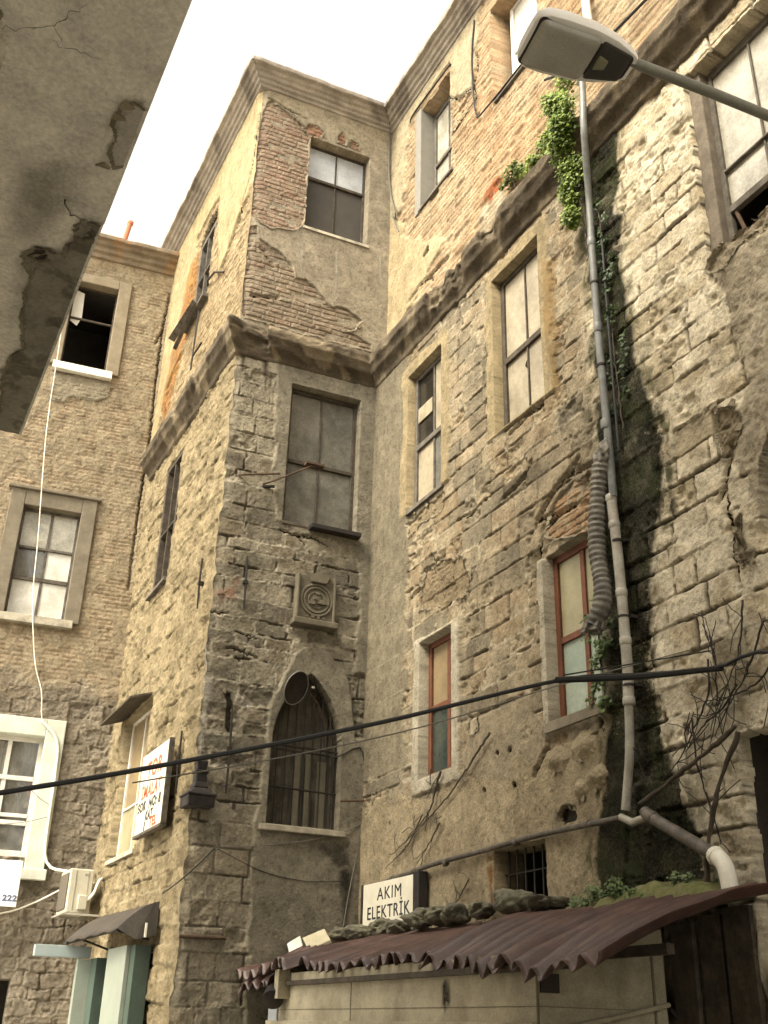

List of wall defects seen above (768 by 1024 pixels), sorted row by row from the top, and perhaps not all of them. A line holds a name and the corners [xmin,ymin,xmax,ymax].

crack [2,7,102,60]
flaking render [0,219,113,434]
peeling [95,100,145,170]
flaking render [242,99,373,352]
flaking render [543,469,592,540]
leakage [579,133,719,905]